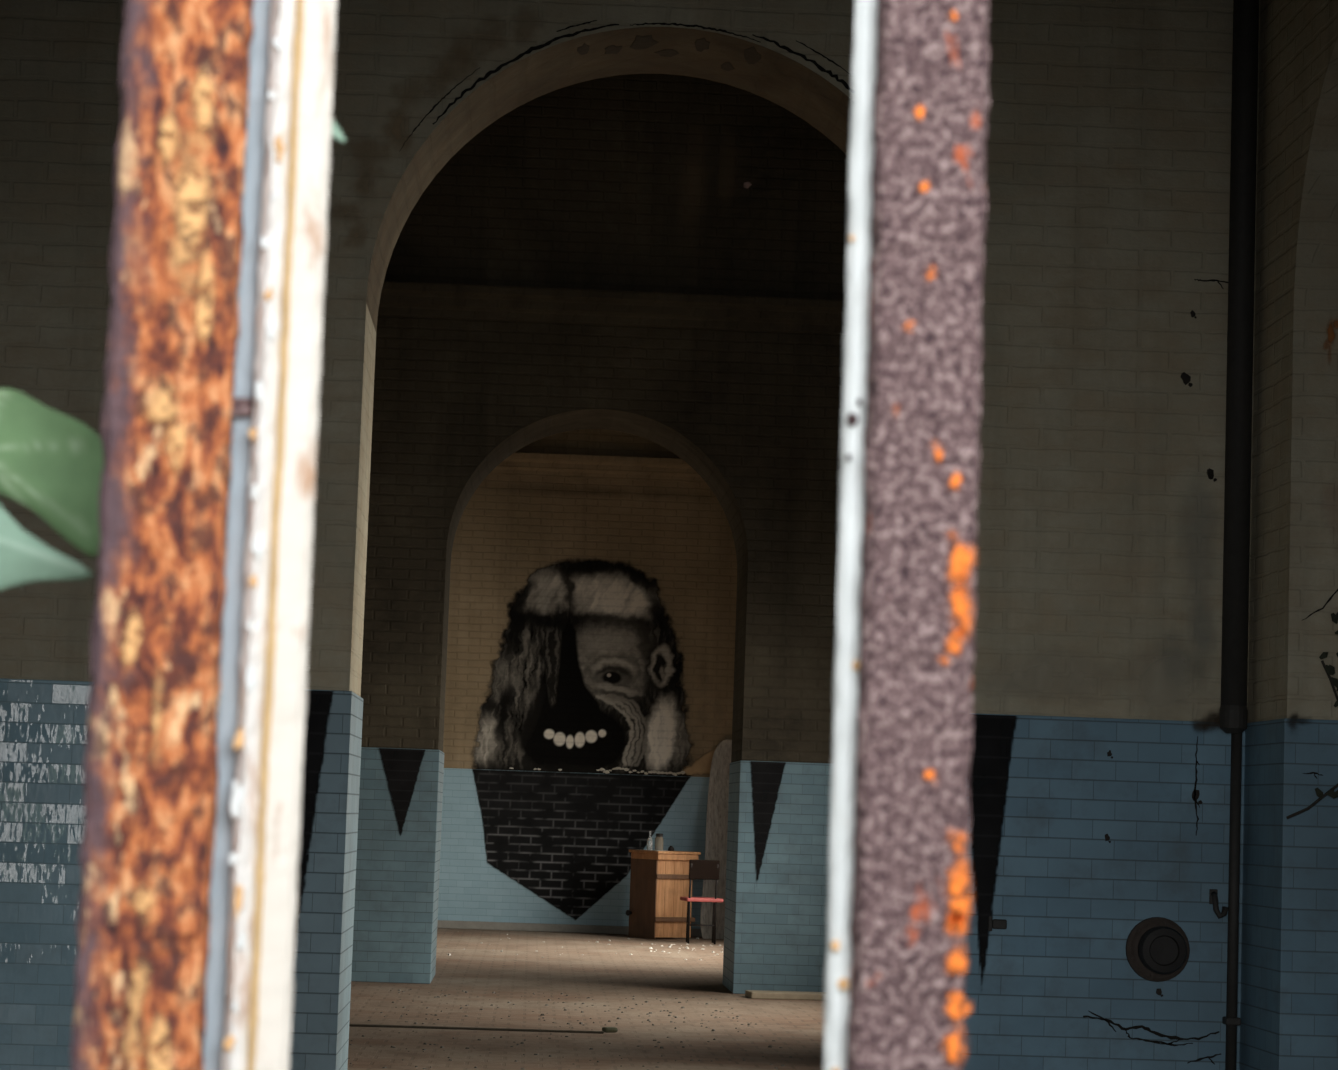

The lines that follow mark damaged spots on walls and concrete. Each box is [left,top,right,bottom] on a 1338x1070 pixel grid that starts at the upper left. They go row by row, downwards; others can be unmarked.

rust [159,115,180,159]
rust [193,74,214,130]
rust [175,163,214,339]
rust [149,390,186,467]
rust [950,473,961,488]
rust [123,614,141,662]
rust [941,544,975,663]
crack [1193,736,1201,836]
rust [946,833,971,973]
rust [125,969,171,1070]
rust [945,992,971,1062]
crack [1083,1011,1221,1064]